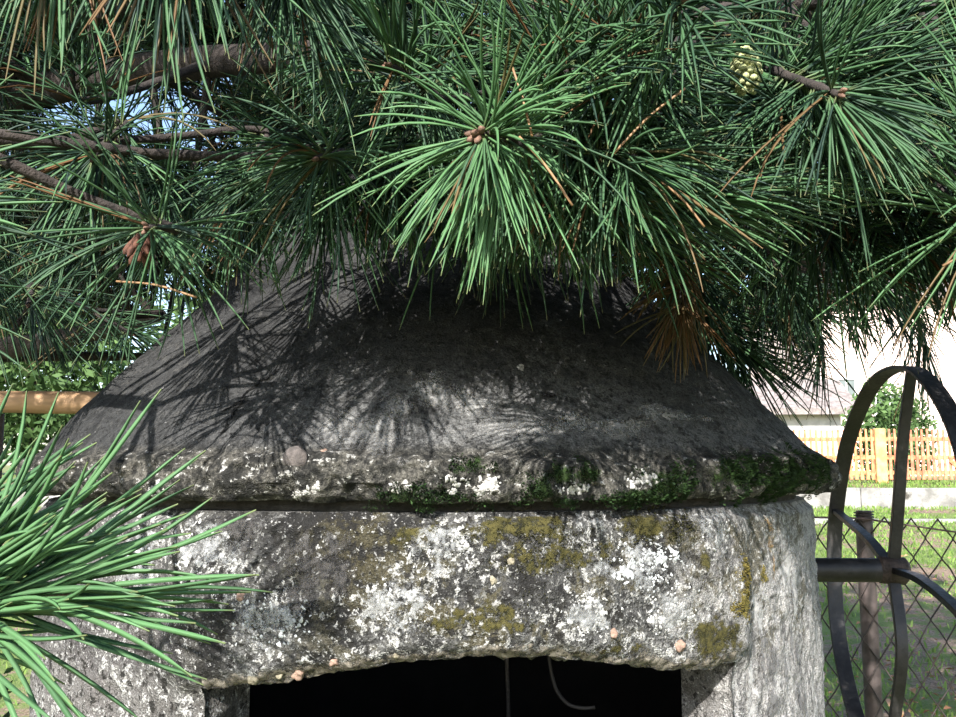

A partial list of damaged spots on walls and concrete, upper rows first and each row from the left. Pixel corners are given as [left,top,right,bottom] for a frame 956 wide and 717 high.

crack [220,365,282,433]